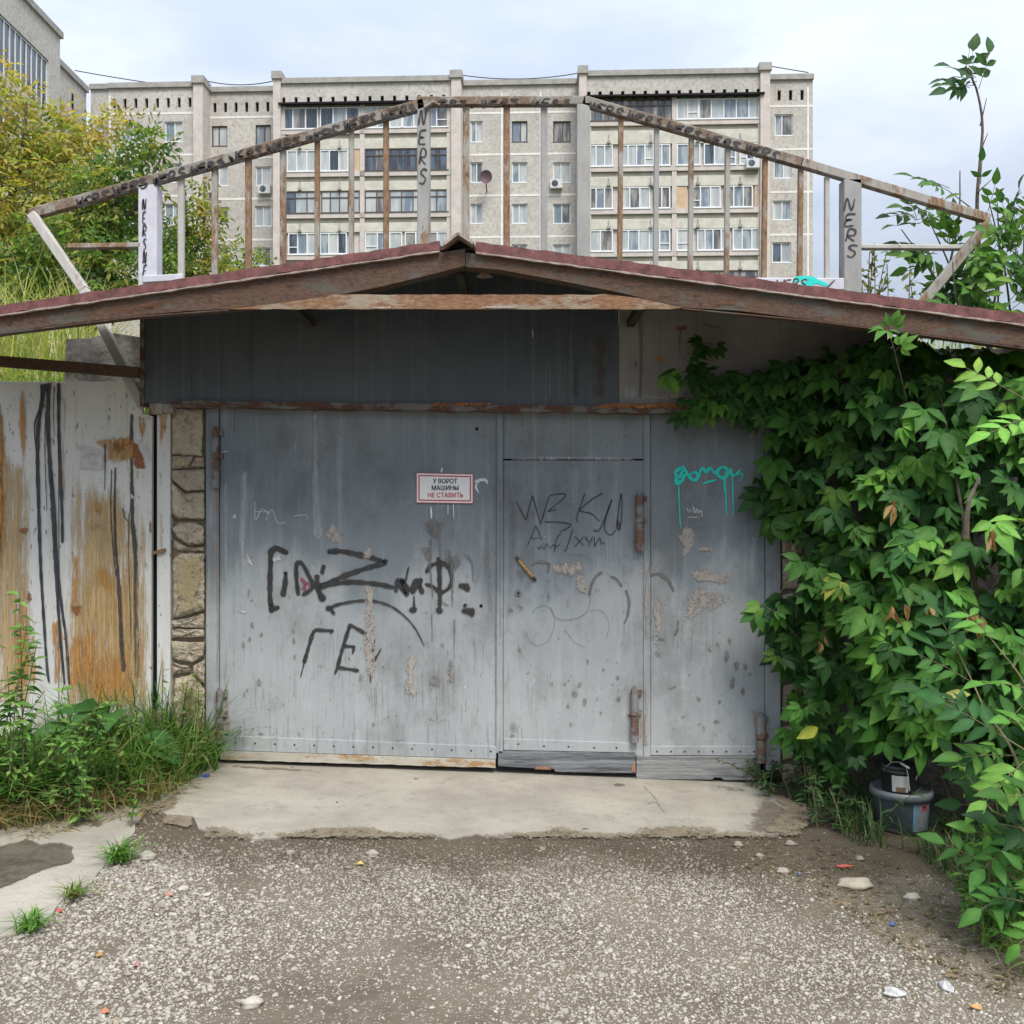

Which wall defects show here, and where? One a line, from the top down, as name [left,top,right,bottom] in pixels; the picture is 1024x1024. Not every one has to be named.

corrosion [97,417,146,478]
peeling [678,527,714,559]
corrosion [52,449,162,709]